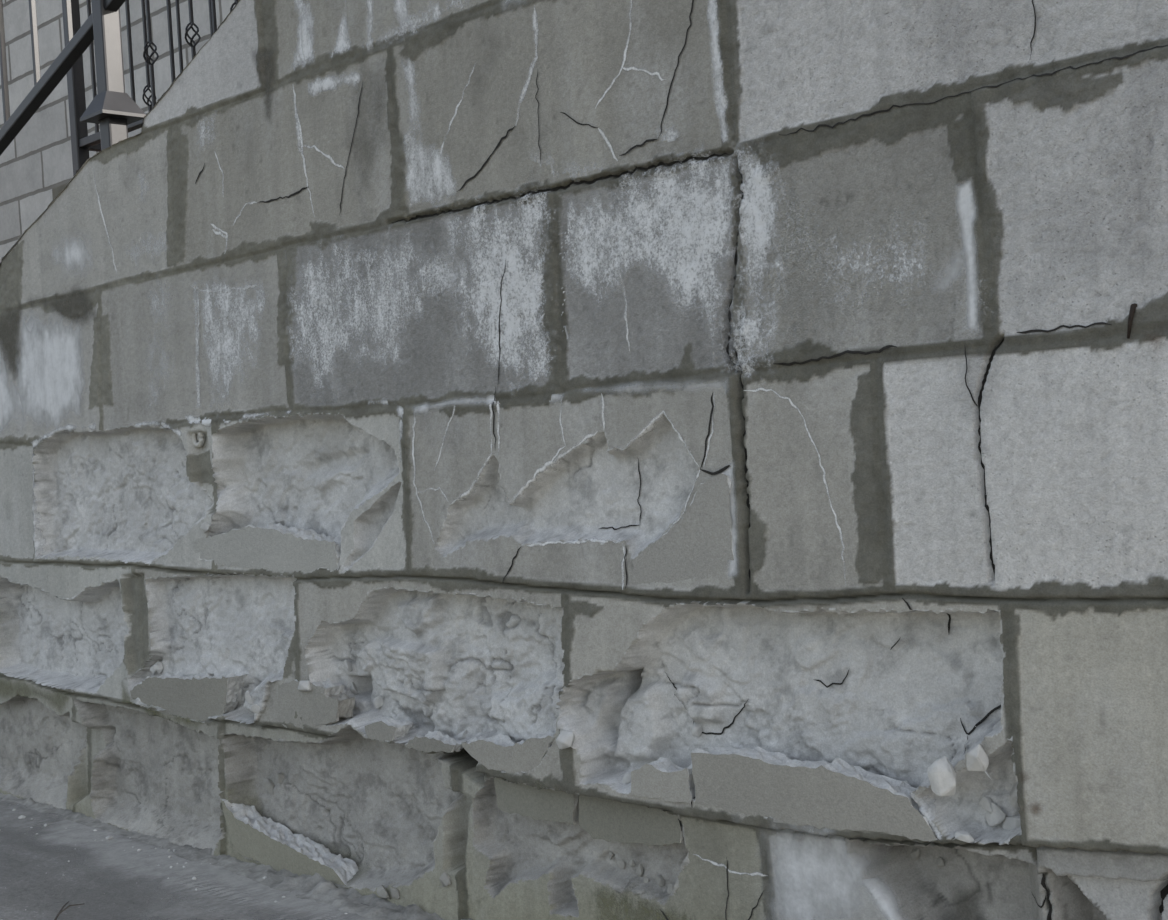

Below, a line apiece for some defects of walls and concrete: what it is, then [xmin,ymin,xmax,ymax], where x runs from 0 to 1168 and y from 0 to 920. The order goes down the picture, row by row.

damp [308,72,360,96]
damp [403,61,455,205]
crack [391,0,744,223]
damp [707,0,728,141]
crack [779,0,1167,135]
damp [0,290,91,447]
damp [289,189,553,388]
damp [381,396,496,437]
crack [412,231,897,590]
damp [560,150,789,374]
crack [965,322,1112,581]
spalling [0,413,1111,920]